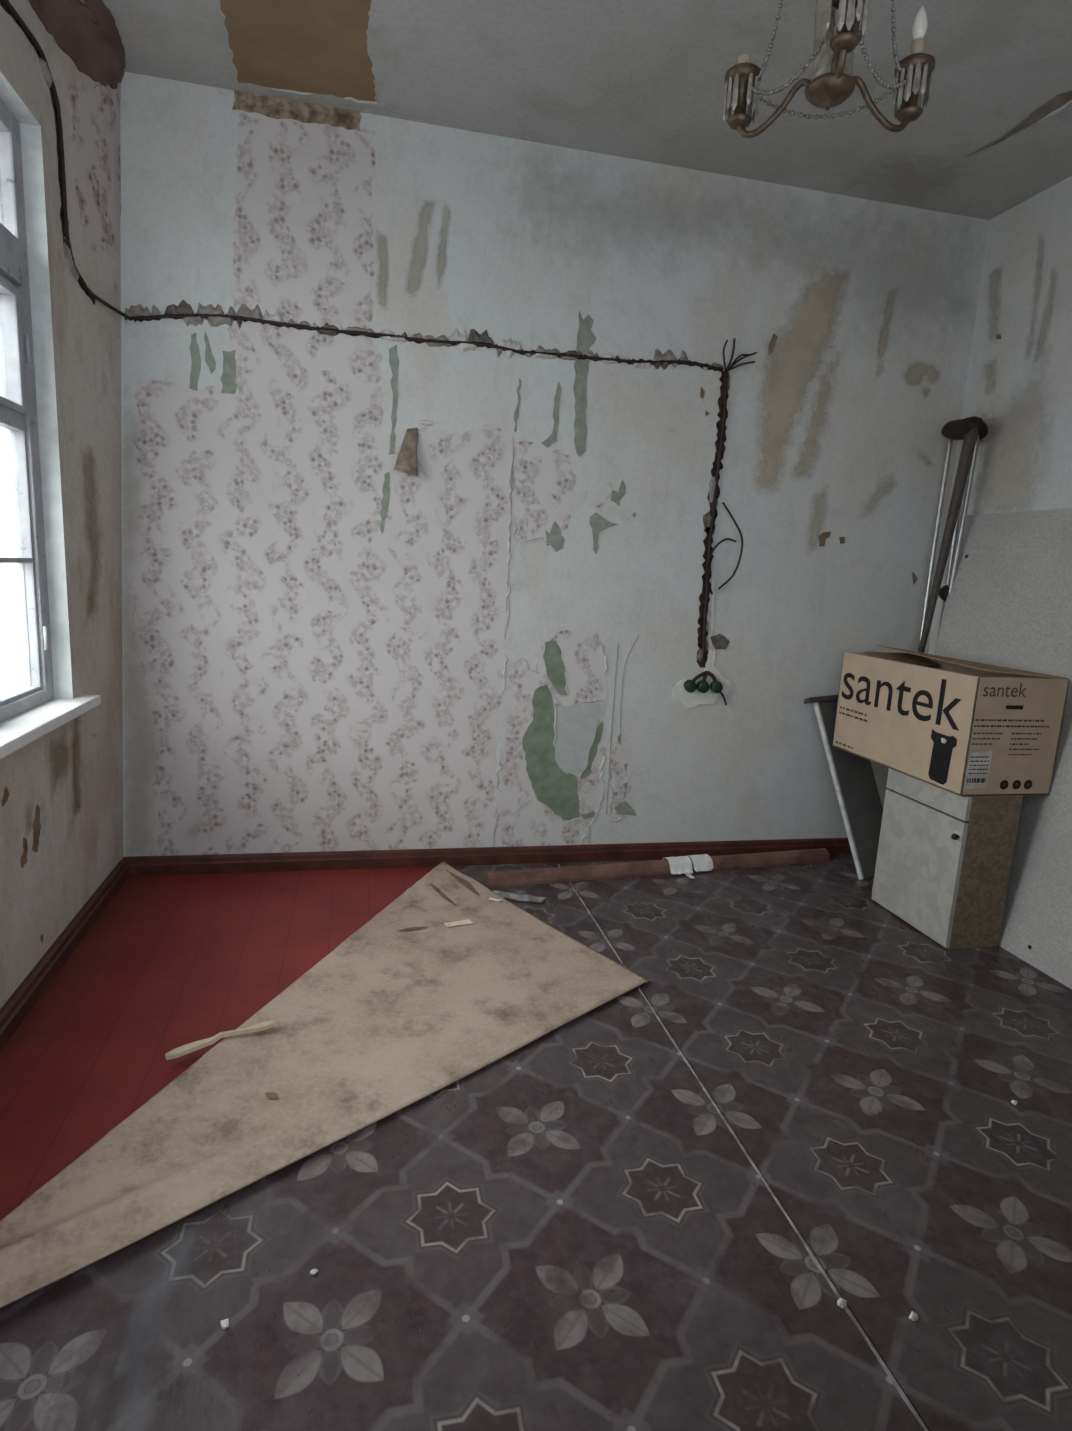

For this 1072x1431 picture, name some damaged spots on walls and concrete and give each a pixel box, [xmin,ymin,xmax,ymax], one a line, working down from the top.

peeling [219,0,377,104]
spalling [768,333,778,356]
crack [504,437,514,639]
spalling [818,531,845,547]
flaking render [544,640,621,779]
peeling [616,763,636,816]